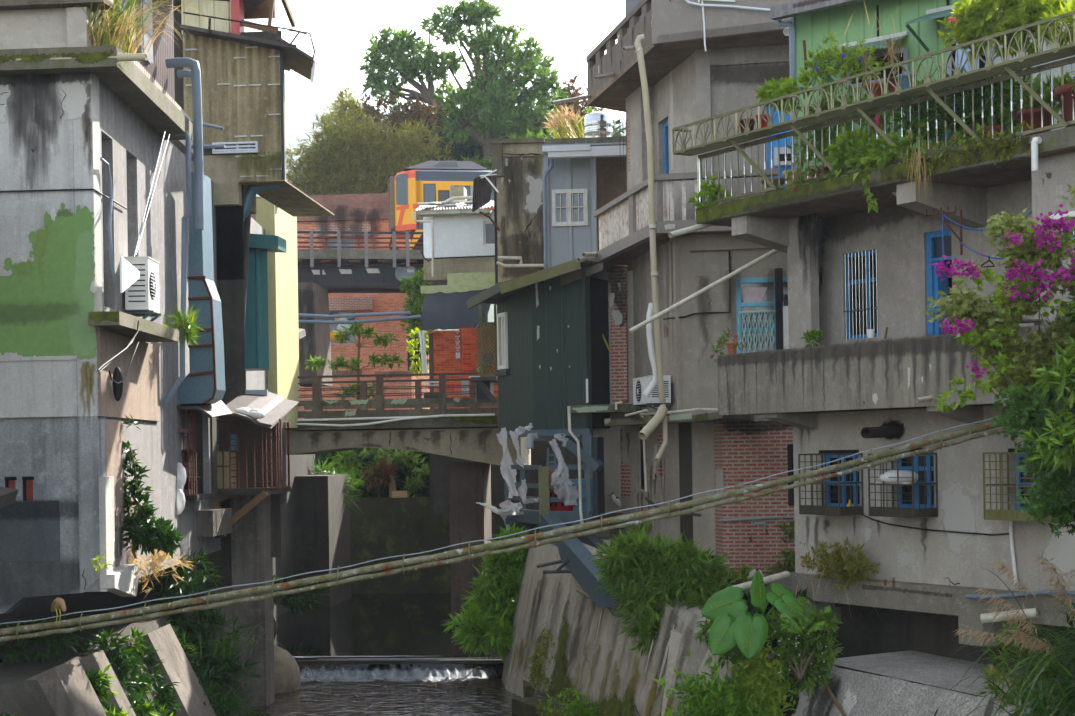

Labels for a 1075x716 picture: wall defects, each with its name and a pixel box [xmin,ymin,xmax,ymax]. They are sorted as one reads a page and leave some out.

water stain [0,73,91,169]
water stain [798,205,928,296]
water stain [81,363,94,415]
water stain [564,612,674,716]